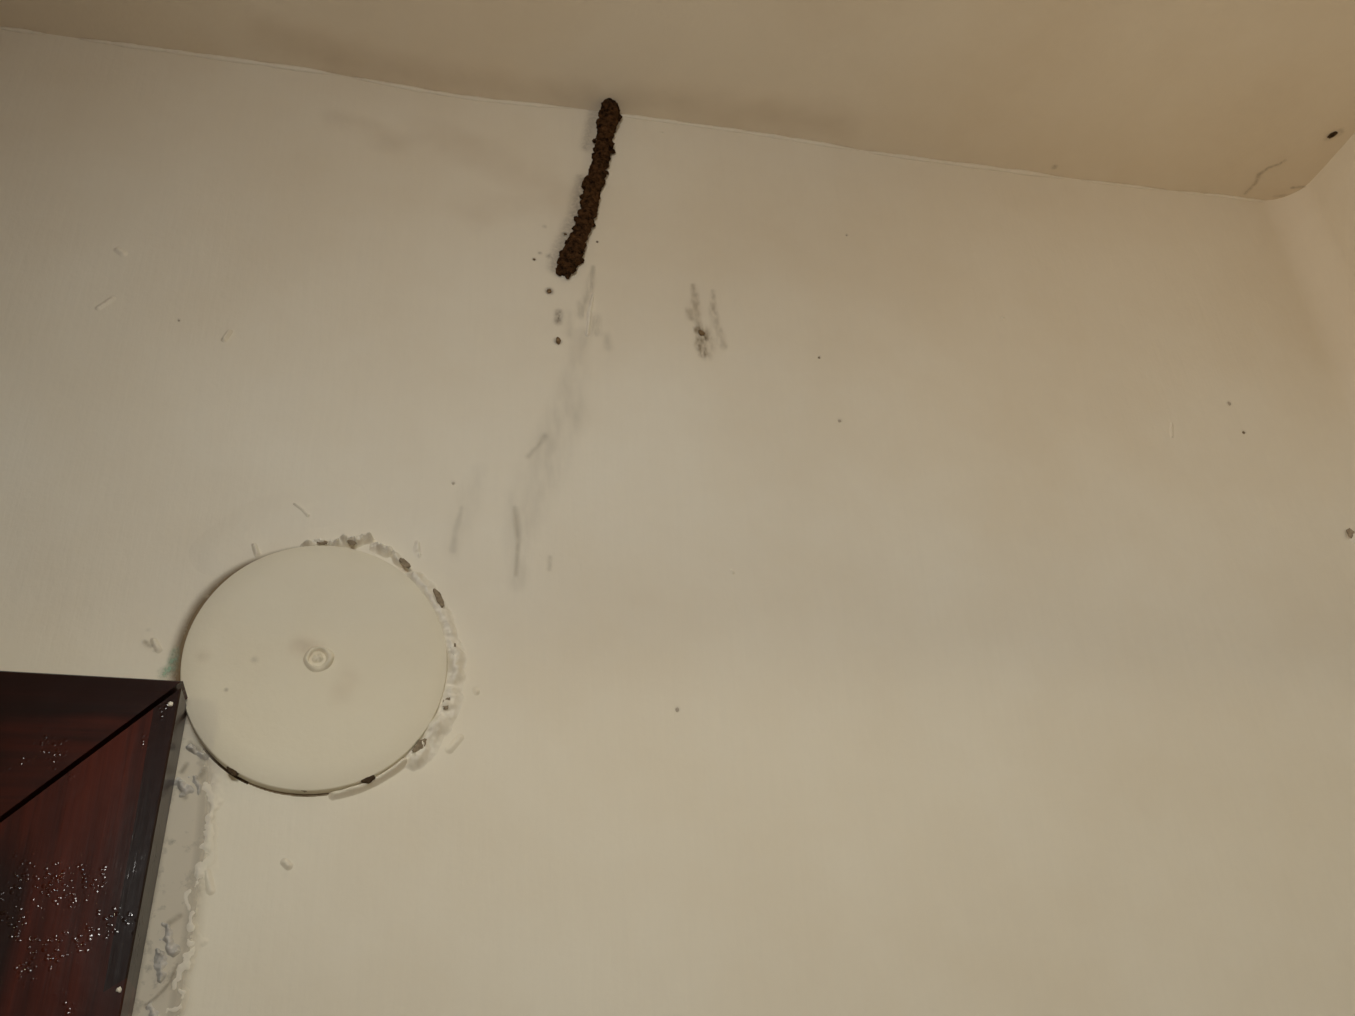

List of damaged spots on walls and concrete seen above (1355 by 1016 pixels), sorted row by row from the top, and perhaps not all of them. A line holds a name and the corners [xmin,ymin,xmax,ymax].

flaking render [132,718,230,1016]